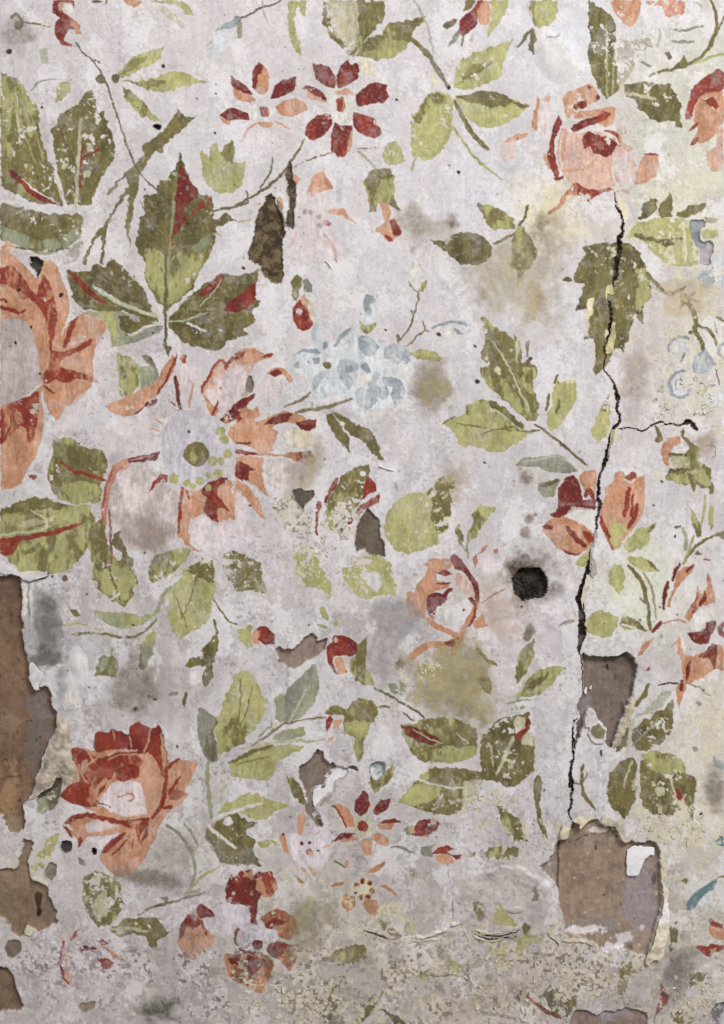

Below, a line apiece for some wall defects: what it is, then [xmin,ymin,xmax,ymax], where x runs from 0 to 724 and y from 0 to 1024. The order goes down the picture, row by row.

crack [575,192,698,686]
peeling [275,632,328,670]
peeling [573,651,639,751]
peeling [0,561,111,1012]
peeling [298,749,359,829]
crack [567,718,578,820]
peeling [450,805,706,1014]